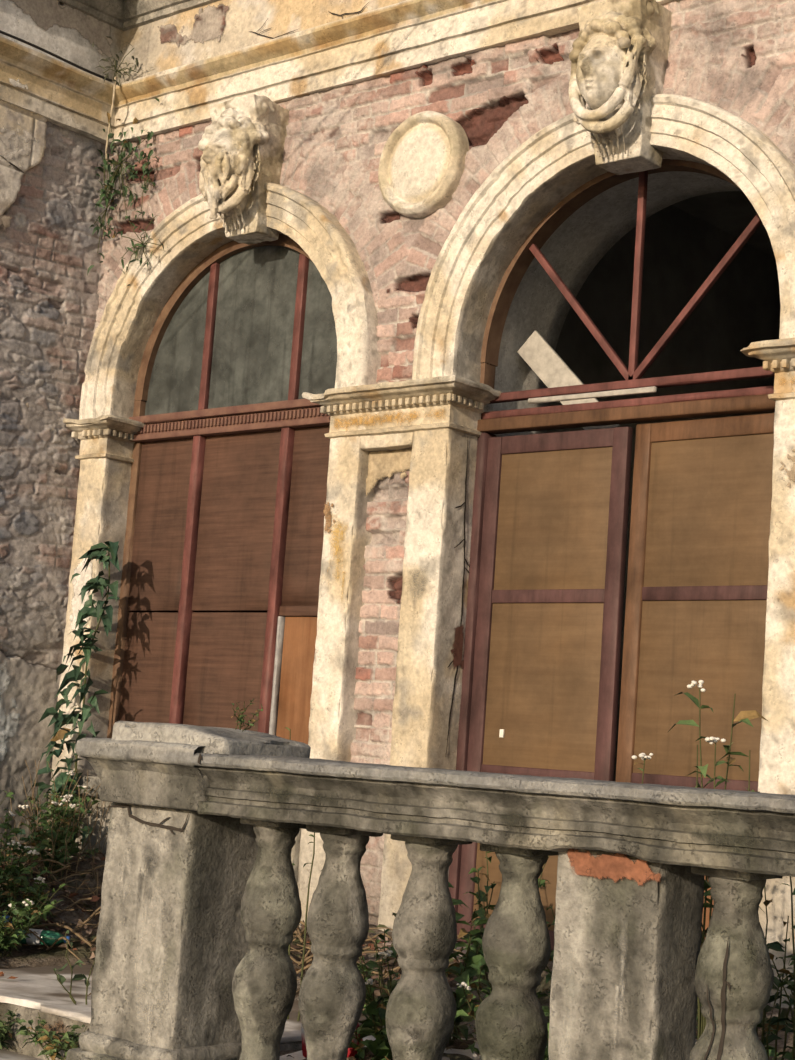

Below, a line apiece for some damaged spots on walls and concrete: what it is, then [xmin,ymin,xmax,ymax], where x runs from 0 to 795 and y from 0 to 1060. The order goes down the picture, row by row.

spalling [11,0,113,58]
spalling [158,4,229,47]
spalling [131,170,155,182]
spalling [119,220,154,234]
spalling [0,121,113,760]
peeling [366,448,412,495]
spalling [388,579,403,603]
spalling [567,848,661,886]